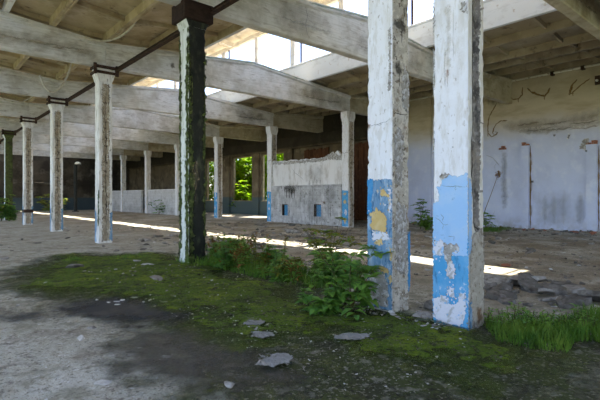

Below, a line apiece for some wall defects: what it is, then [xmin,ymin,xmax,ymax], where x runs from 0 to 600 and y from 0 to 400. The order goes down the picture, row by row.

spalling [272,121,354,226]
spalling [368,127,411,307]
spalling [432,0,486,330]